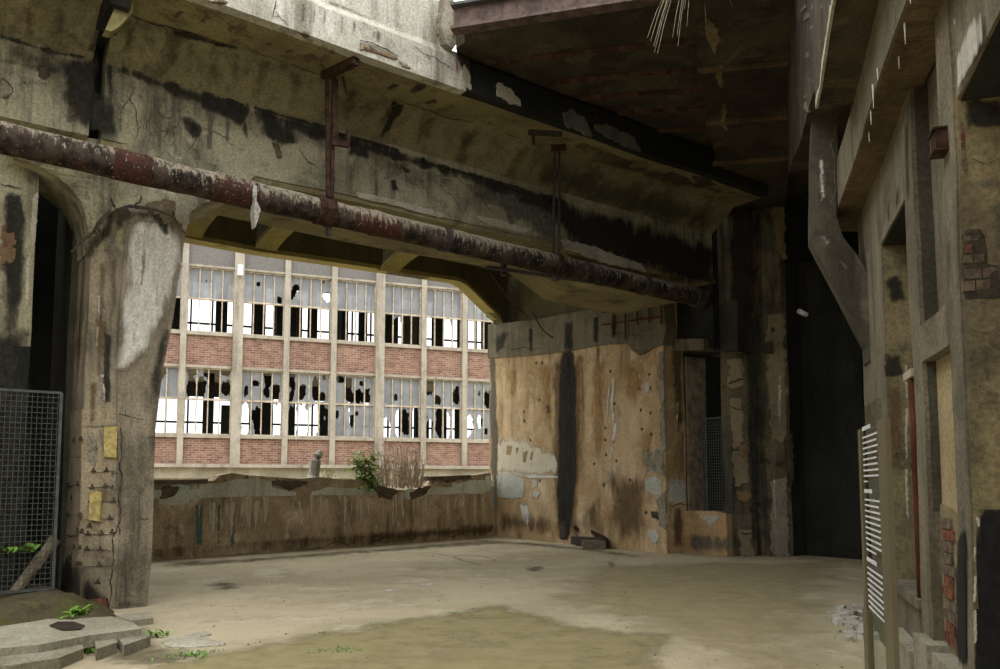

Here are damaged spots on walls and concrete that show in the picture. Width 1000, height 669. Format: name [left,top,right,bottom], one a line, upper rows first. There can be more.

crack [120,86,232,149]
damp [1,12,567,229]
peeling [496,82,521,106]
damp [5,193,25,328]
spalling [145,199,192,232]
spalling [961,229,1000,300]
crack [63,410,154,606]
damp [173,317,617,565]
peeling [312,475,558,500]
damp [611,476,642,536]
peeling [726,351,752,502]
peeling [759,313,795,556]